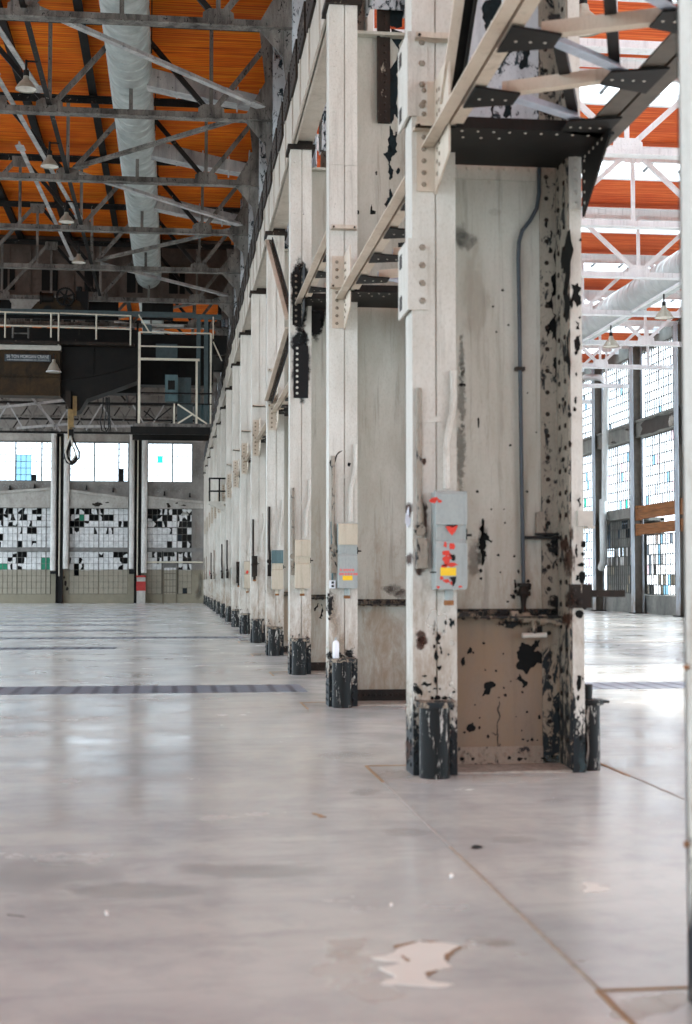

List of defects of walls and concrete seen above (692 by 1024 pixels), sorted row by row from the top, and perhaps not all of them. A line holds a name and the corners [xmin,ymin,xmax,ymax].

peeling [482,0,502,31]
peeling [502,51,530,70]
peeling [375,10,404,208]
peeling [490,105,511,118]
peeling [544,222,582,377]
peeling [478,508,506,580]
peeling [463,640,542,738]
spalling [371,940,461,987]